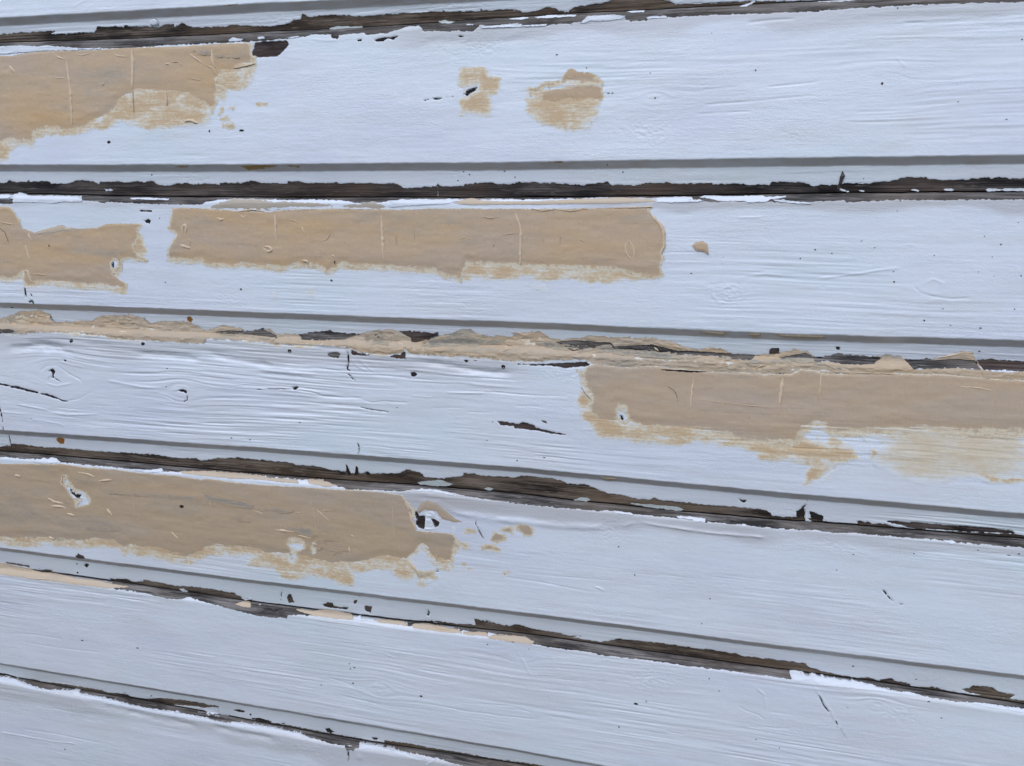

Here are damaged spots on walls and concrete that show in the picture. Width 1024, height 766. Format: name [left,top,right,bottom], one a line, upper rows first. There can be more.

peeling [0,0,1024,58]
peeling [0,171,1024,224]
peeling [216,328,277,338]
peeling [299,330,369,358]
peeling [400,330,438,344]
peeling [518,340,755,368]
peeling [769,347,881,365]
peeling [904,351,1024,372]
peeling [0,444,1024,555]
peeling [111,579,310,619]
peeling [407,618,1024,712]
peeling [0,673,541,766]